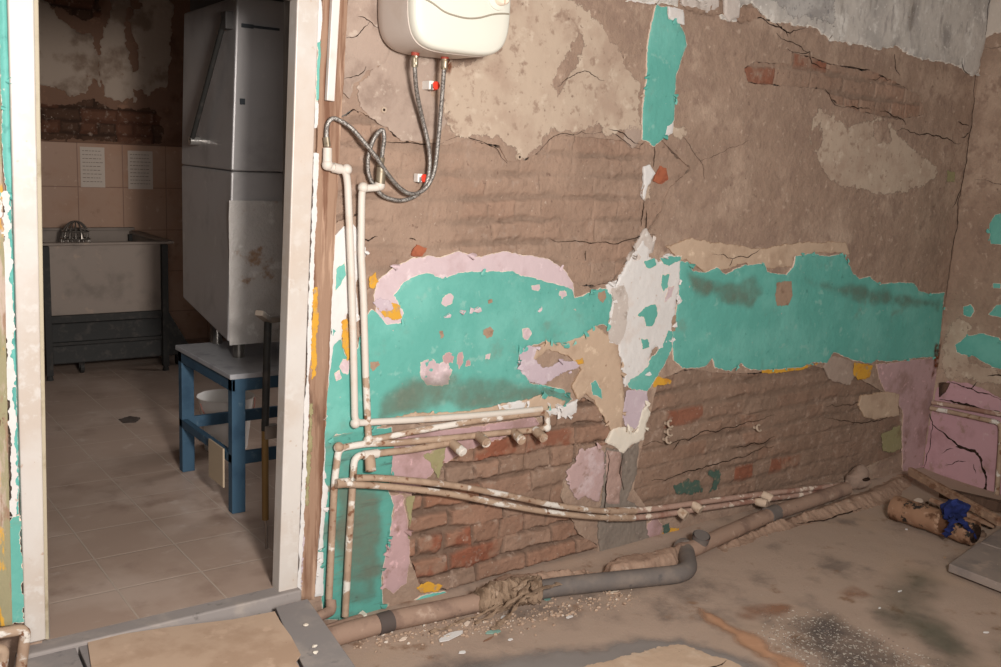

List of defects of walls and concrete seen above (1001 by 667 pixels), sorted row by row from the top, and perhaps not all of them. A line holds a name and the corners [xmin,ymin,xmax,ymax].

peeling [0,0,20,518]
peeling [38,0,174,145]
flaking render [314,0,1001,620]
crack [758,17,1001,294]
crack [924,374,1001,490]